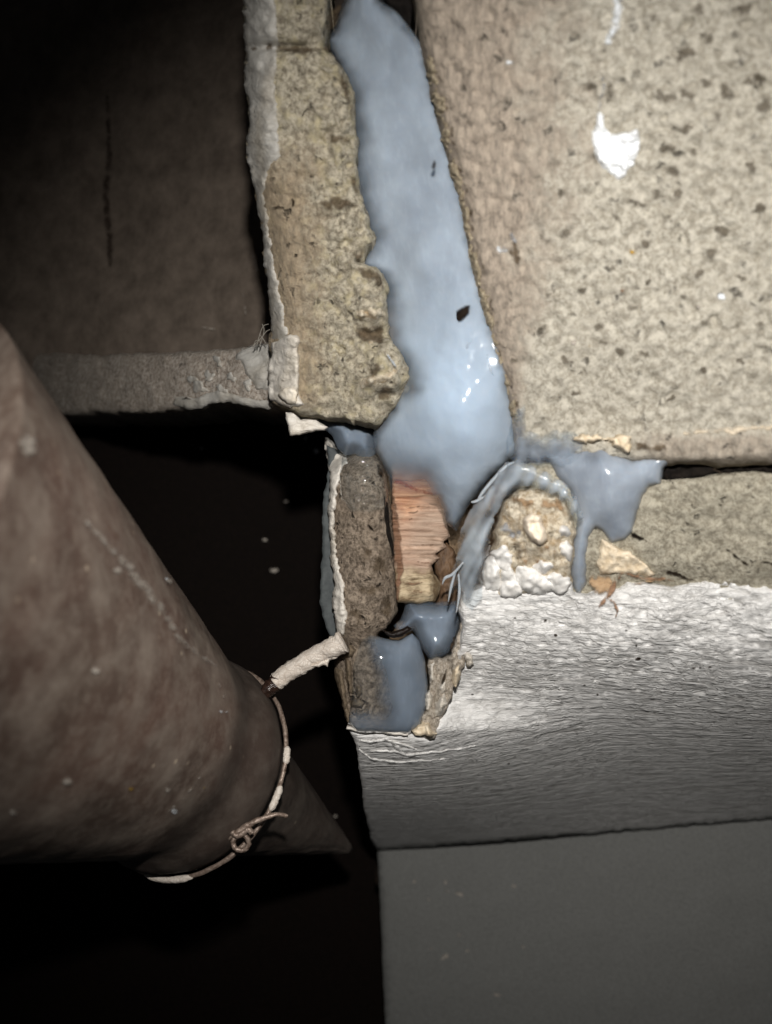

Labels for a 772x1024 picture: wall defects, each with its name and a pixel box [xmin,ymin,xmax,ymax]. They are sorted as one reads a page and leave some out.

crack [662,464,772,484]
spalling [334,645,371,723]
peeling [412,620,474,740]